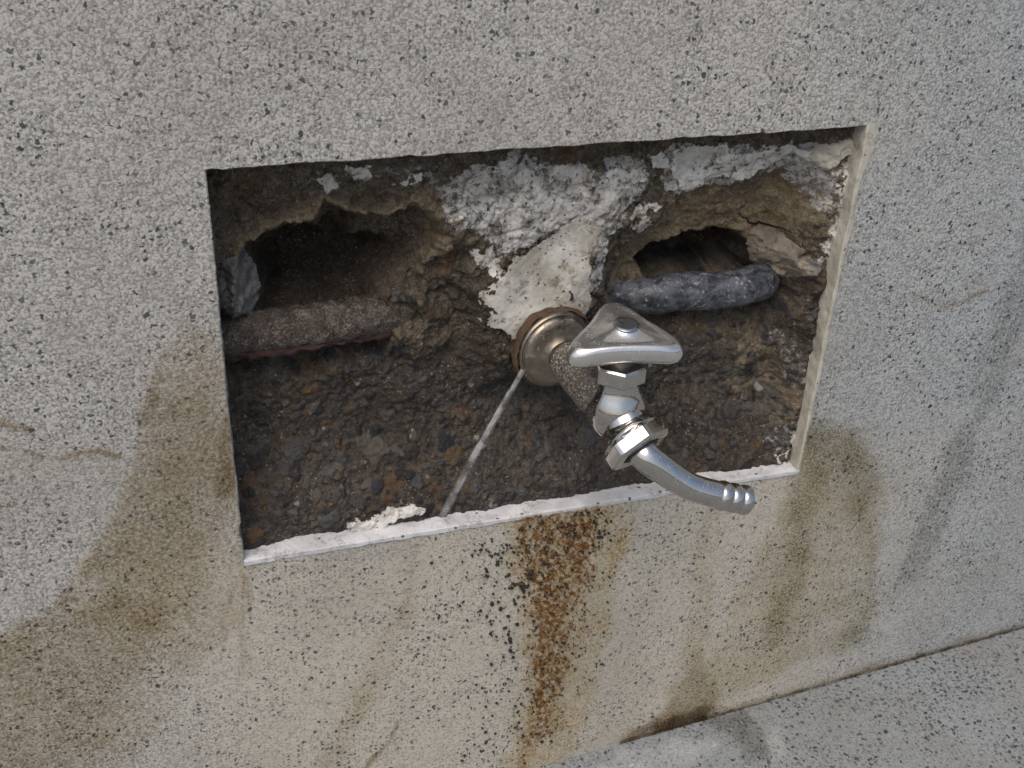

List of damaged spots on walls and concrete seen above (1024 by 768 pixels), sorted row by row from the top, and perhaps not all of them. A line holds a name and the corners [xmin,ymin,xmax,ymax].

spalling [244,164,440,311]
spalling [458,142,849,303]
peeling [774,431,797,465]
rust [514,509,600,747]